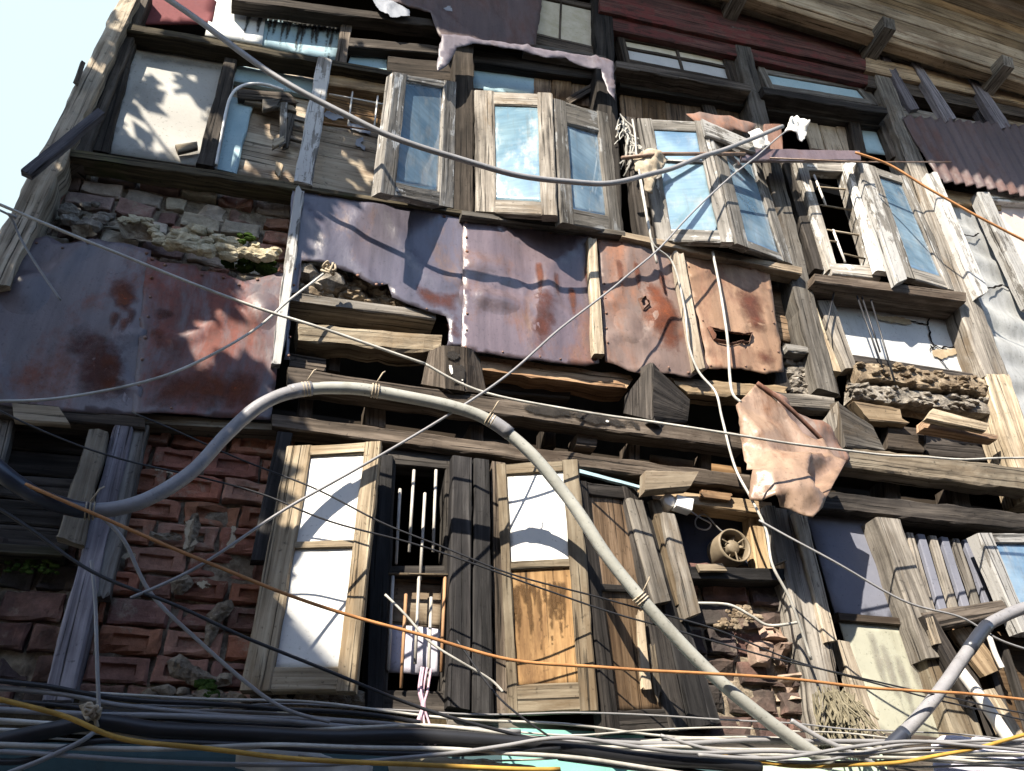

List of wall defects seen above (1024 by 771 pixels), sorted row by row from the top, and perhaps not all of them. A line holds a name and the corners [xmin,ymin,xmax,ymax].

spalling [57,201,282,263]
rust [111,284,135,328]
rust [536,264,558,335]
rust [617,261,677,344]
rust [743,294,762,326]
rust [72,335,119,391]
crack [911,318,955,370]